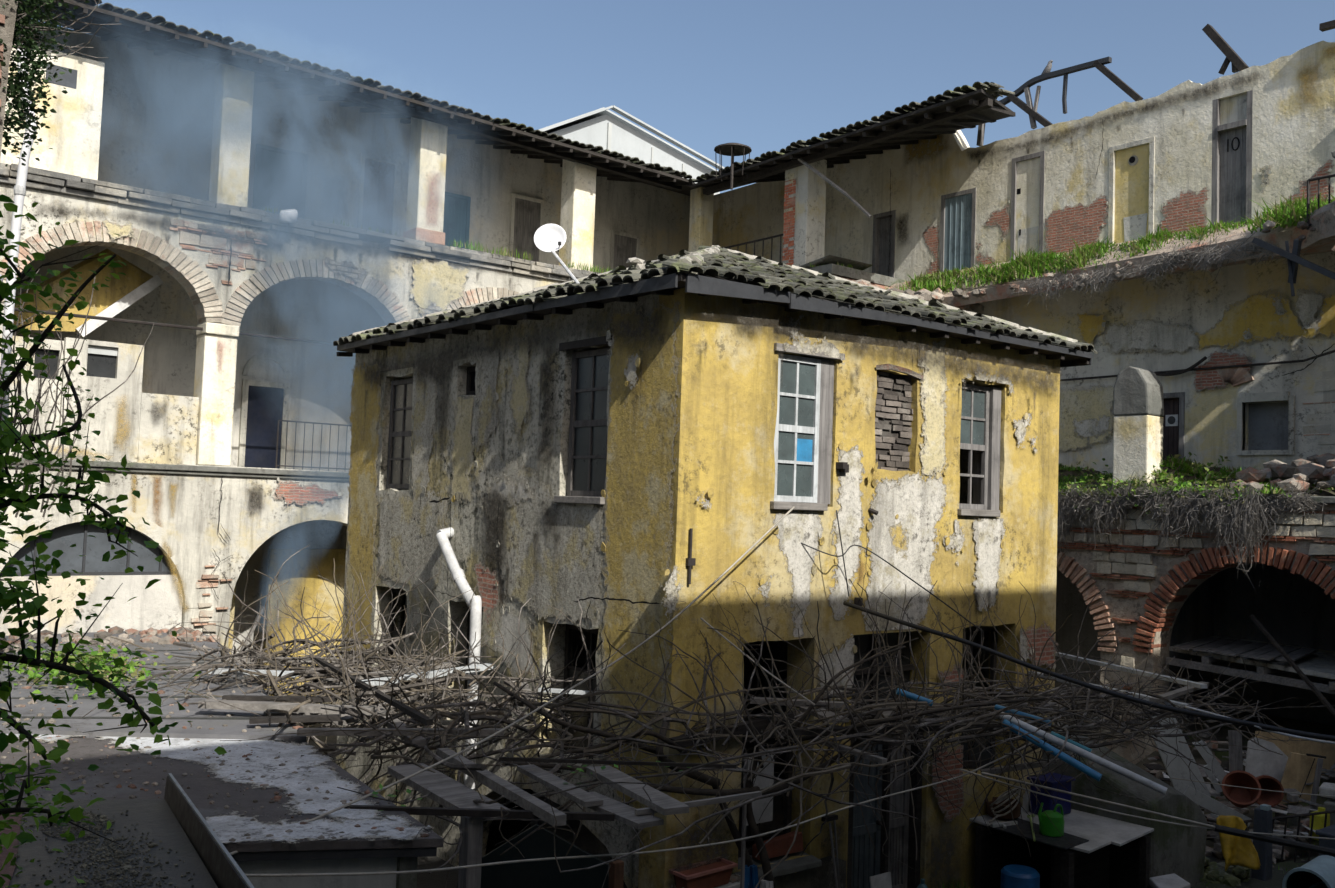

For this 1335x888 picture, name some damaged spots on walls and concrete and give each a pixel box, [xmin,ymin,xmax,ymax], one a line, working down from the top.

flaking render [984,200,1010,241]
flaking render [1044,194,1109,254]
flaking render [1159,188,1209,234]
flaking render [783,334,845,365]
flaking render [271,477,343,506]
leakage [484,491,509,592]
peeling [473,450,606,678]
peeling [756,339,1014,701]
flaking render [932,744,965,822]